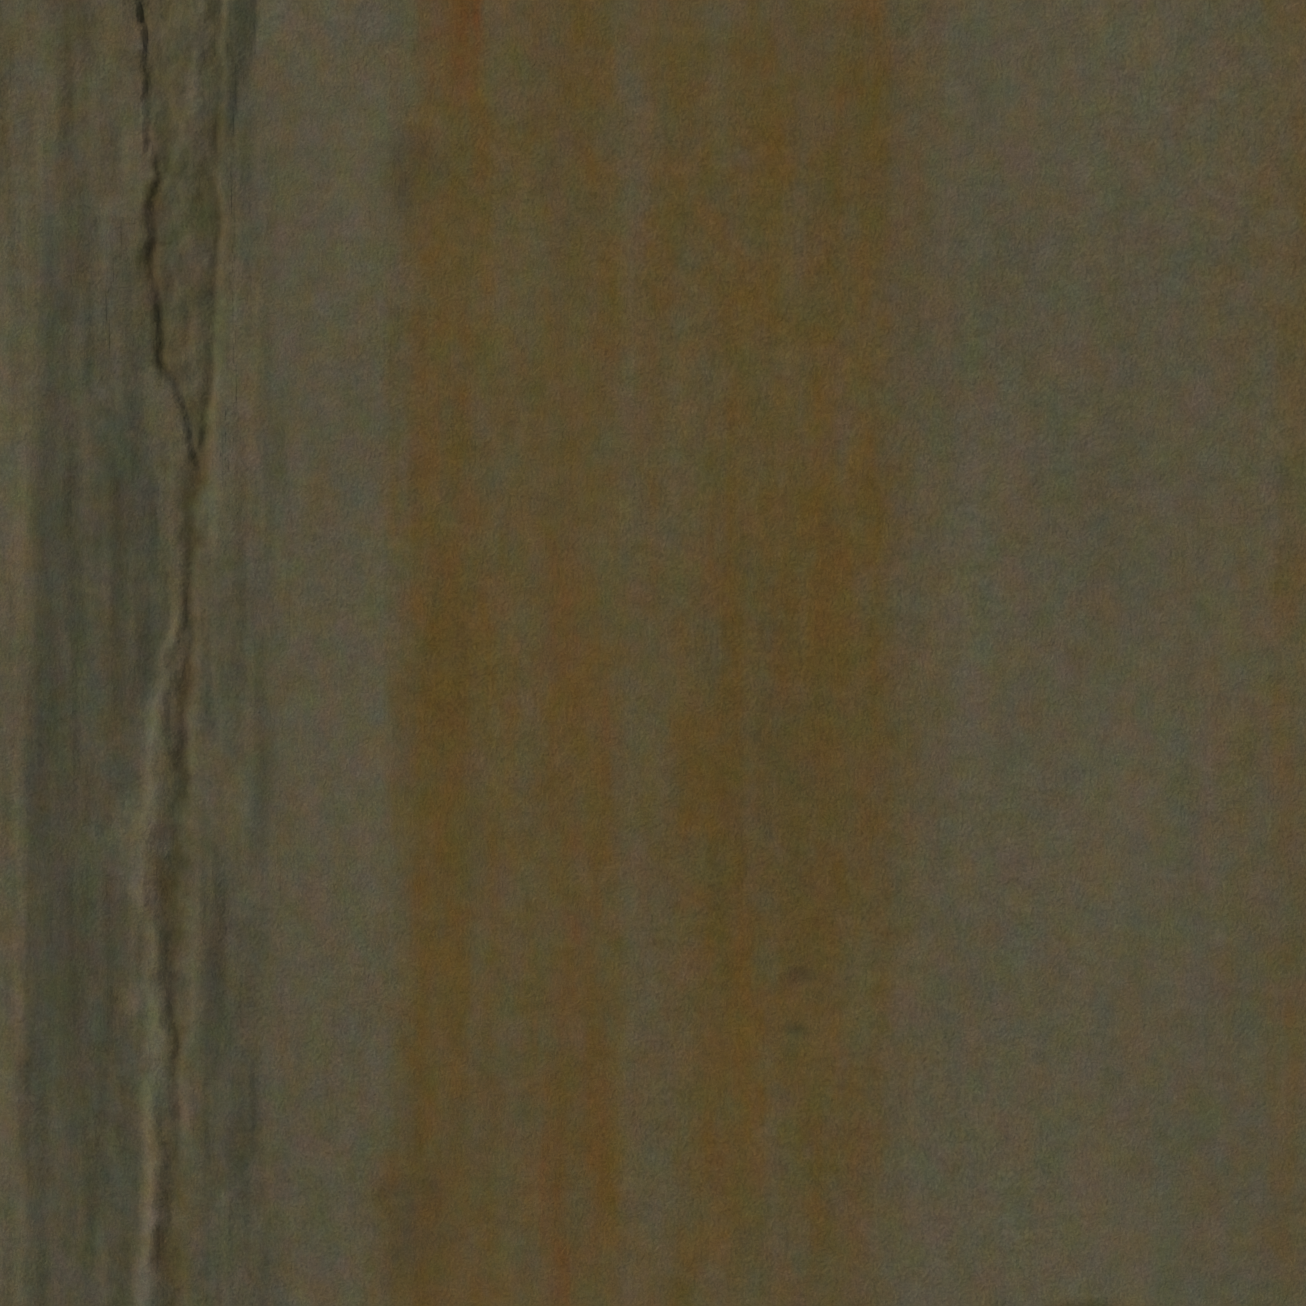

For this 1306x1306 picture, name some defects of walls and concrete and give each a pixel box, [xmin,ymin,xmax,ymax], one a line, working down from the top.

water stain [0,0,297,1306]